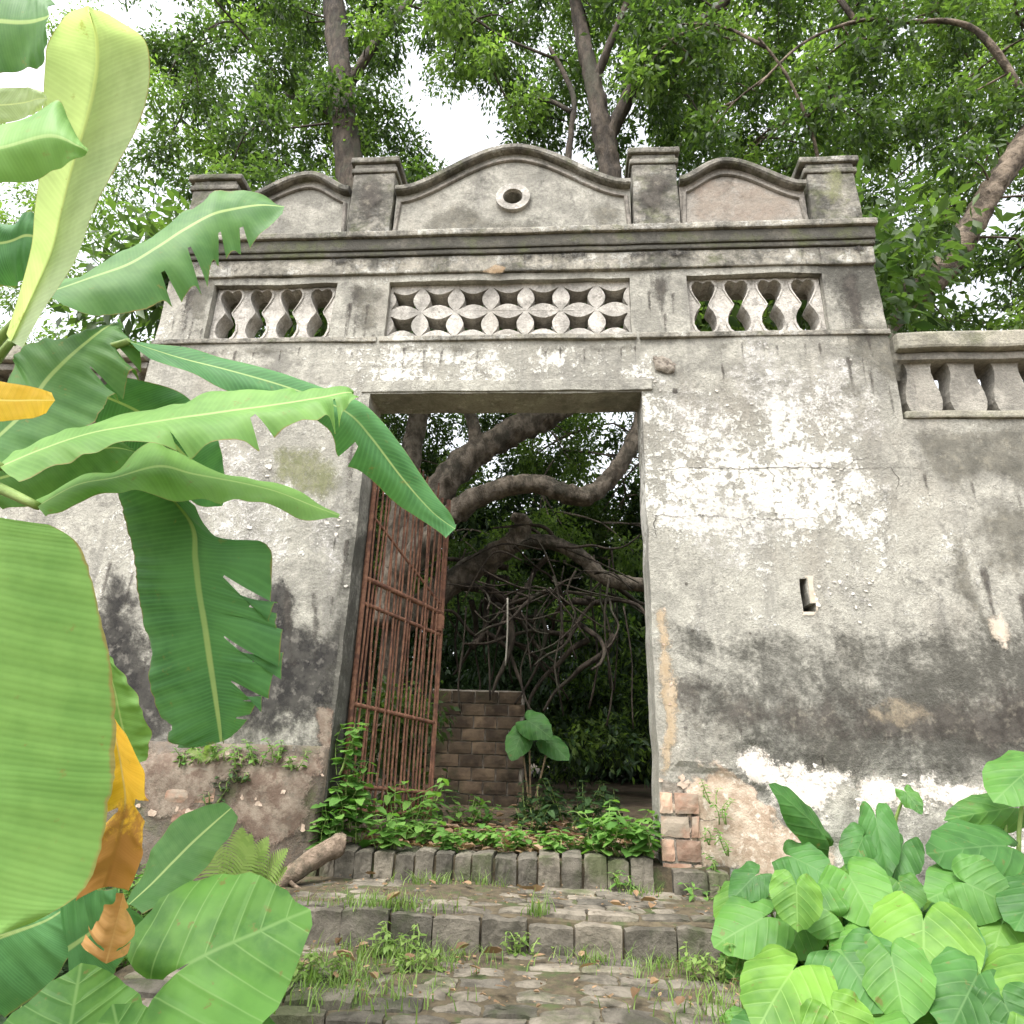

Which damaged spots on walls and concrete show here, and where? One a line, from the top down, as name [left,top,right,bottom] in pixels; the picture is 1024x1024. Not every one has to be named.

peeling [653,341,888,455]
damp [99,563,170,738]
damp [239,580,339,735]
damp [676,676,708,712]
spalling [656,607,987,876]
damp [719,687,1024,767]